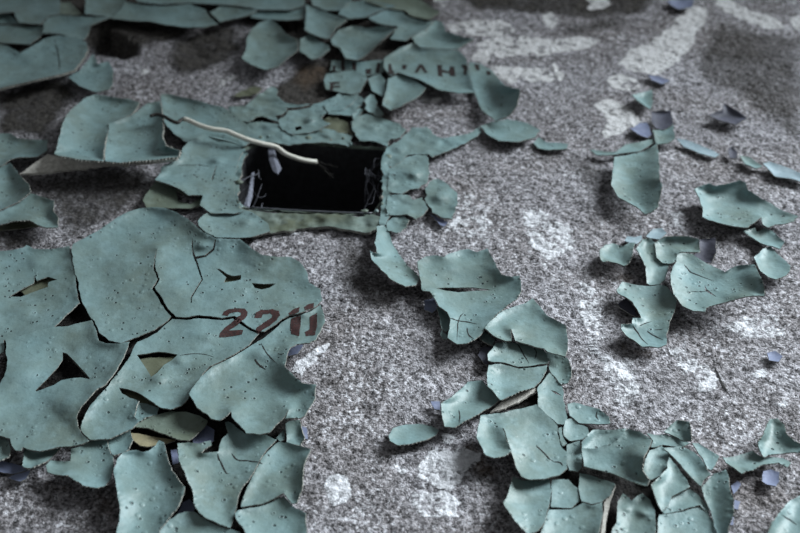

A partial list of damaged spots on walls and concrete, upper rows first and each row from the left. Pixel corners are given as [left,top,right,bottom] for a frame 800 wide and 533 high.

peeling [589,75,800,215]
crack [71,249,106,342]
crack [79,239,322,437]
peeling [0,0,476,533]
peeling [370,62,741,533]
peeling [599,180,798,348]
peeling [767,351,782,362]
crack [218,454,262,474]
peeling [723,418,800,487]
peeling [767,496,800,533]